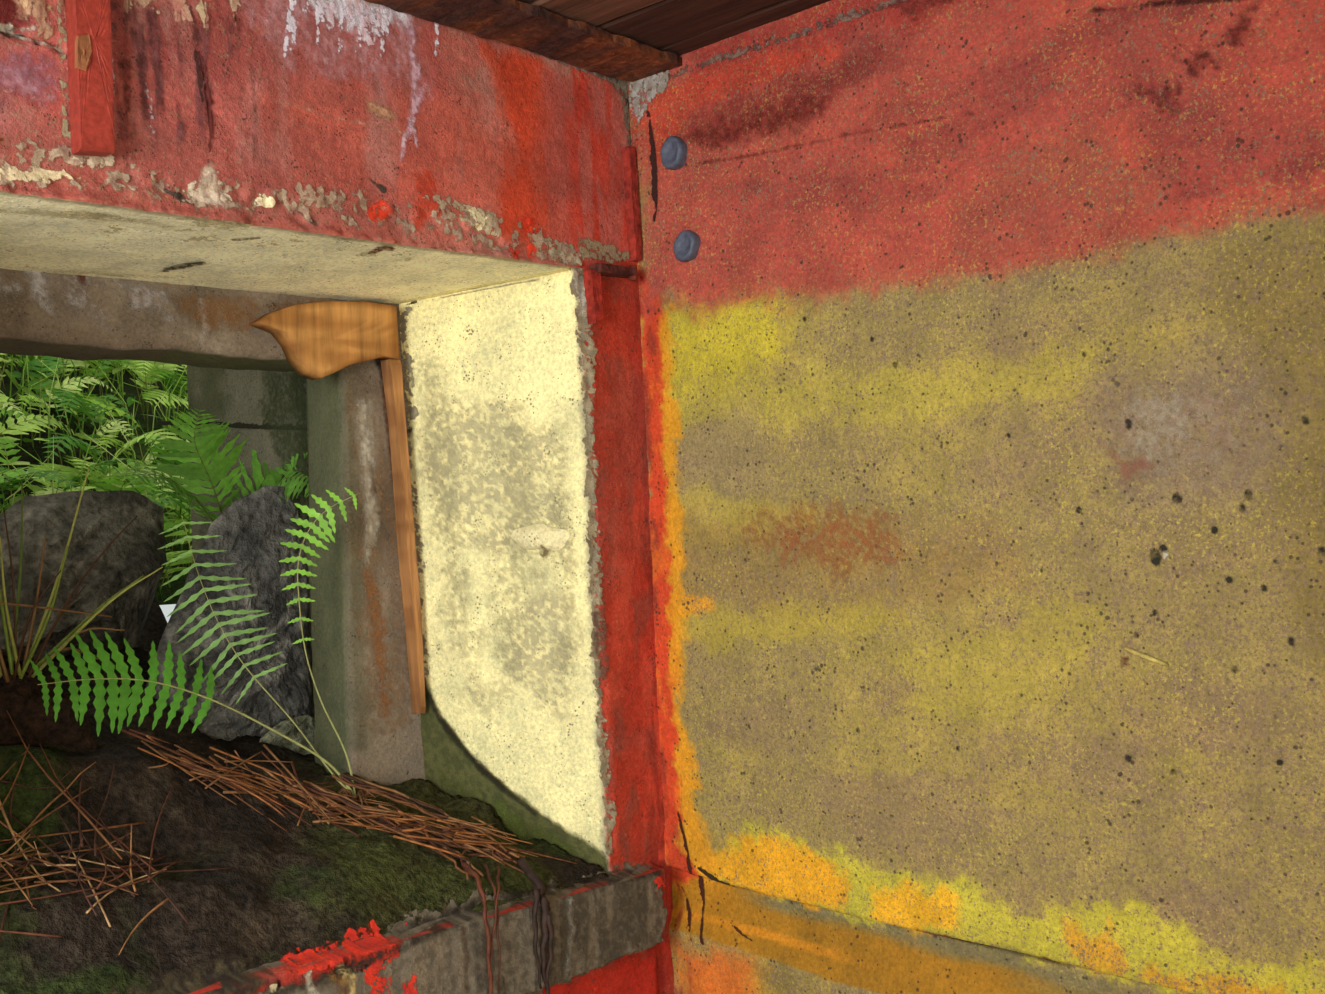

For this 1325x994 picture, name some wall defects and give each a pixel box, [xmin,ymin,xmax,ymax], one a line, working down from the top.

crack [0,23,62,53]
damp [110,1,164,120]
damp [177,14,209,144]
damp [246,0,428,158]
spalling [530,0,951,146]
peeling [0,0,668,994]